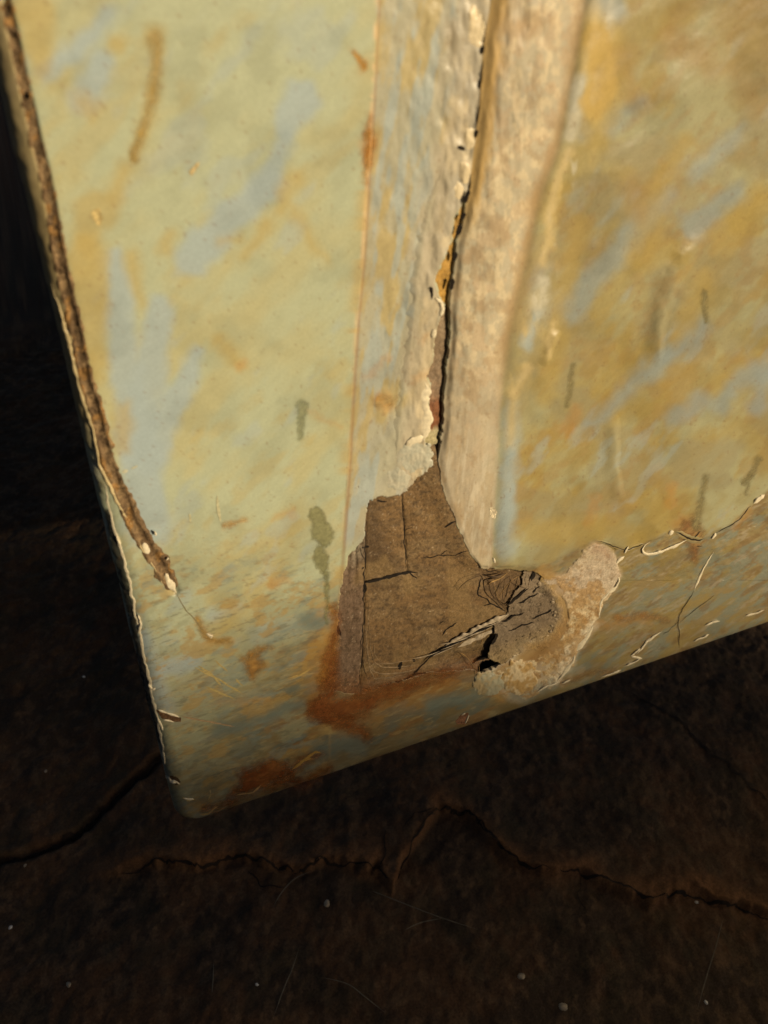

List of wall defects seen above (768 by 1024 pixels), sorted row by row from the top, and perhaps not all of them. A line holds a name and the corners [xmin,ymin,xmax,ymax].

crack [406,4,487,447]
corrosion [0,0,228,643]
damp [297,401,308,439]
damp [309,506,333,618]
spalling [332,443,688,701]
crack [597,540,647,552]
crack [665,591,711,648]
crack [676,506,751,547]
corrosion [310,631,449,738]